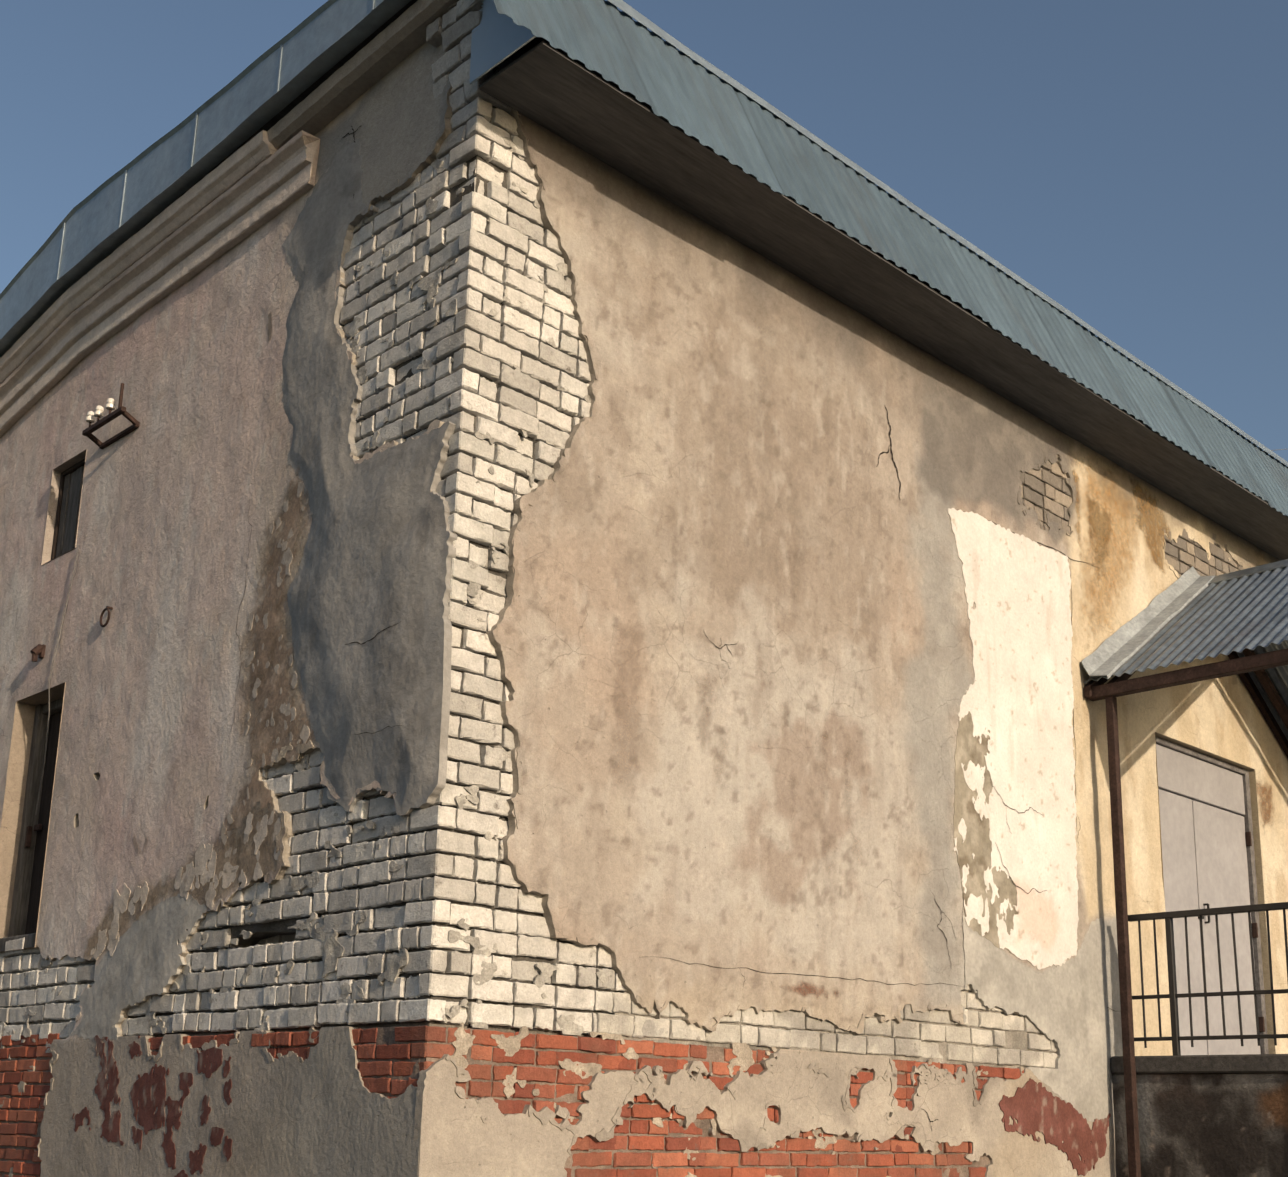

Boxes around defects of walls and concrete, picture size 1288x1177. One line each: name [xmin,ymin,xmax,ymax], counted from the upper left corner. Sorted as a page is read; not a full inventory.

crack [877,407,901,498]
spalling [121,0,1058,1177]
damp [1073,472,1169,622]
peeling [1163,529,1251,579]
peeling [947,455,1079,970]
spalling [0,807,280,1177]
peeling [999,1078,1111,1177]